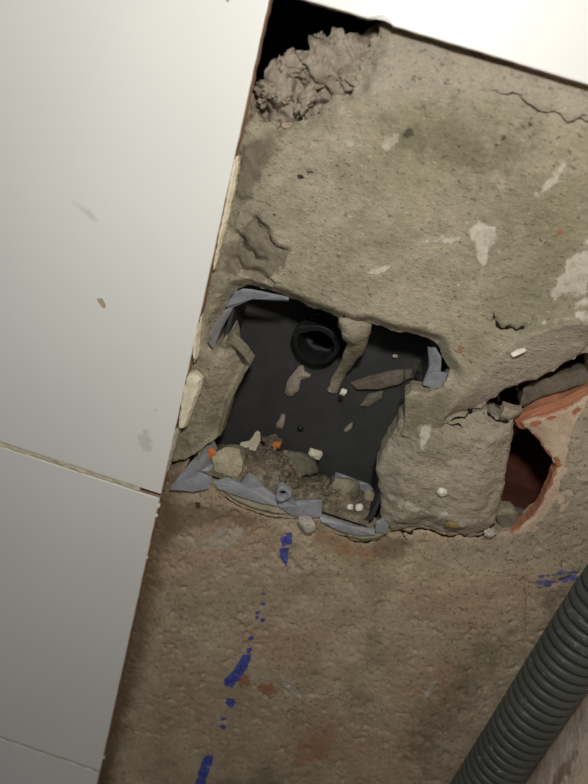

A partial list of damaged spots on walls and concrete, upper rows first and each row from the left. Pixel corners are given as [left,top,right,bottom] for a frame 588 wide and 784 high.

crack [488,90,588,123]
crack [493,311,525,331]
peeling [309,448,323,460]
crack [337,527,484,543]